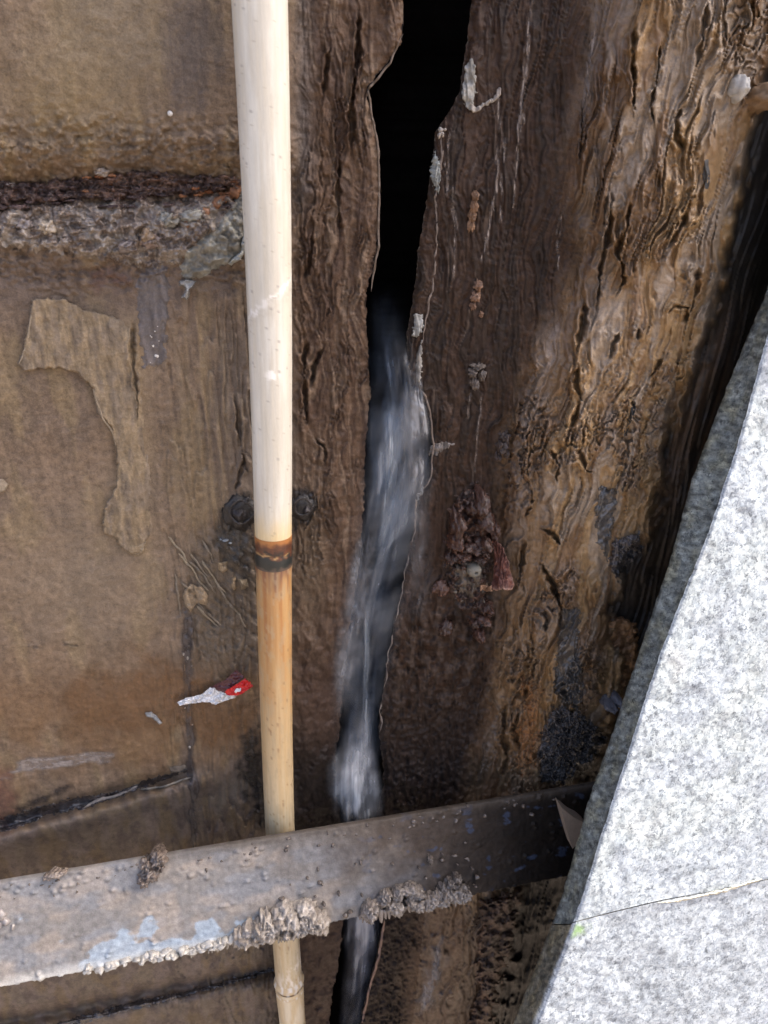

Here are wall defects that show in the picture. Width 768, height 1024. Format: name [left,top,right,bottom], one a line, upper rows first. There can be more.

crack [333,0,501,823]
damp [376,0,602,817]
crack [329,917,385,1024]
damp [360,910,441,1024]